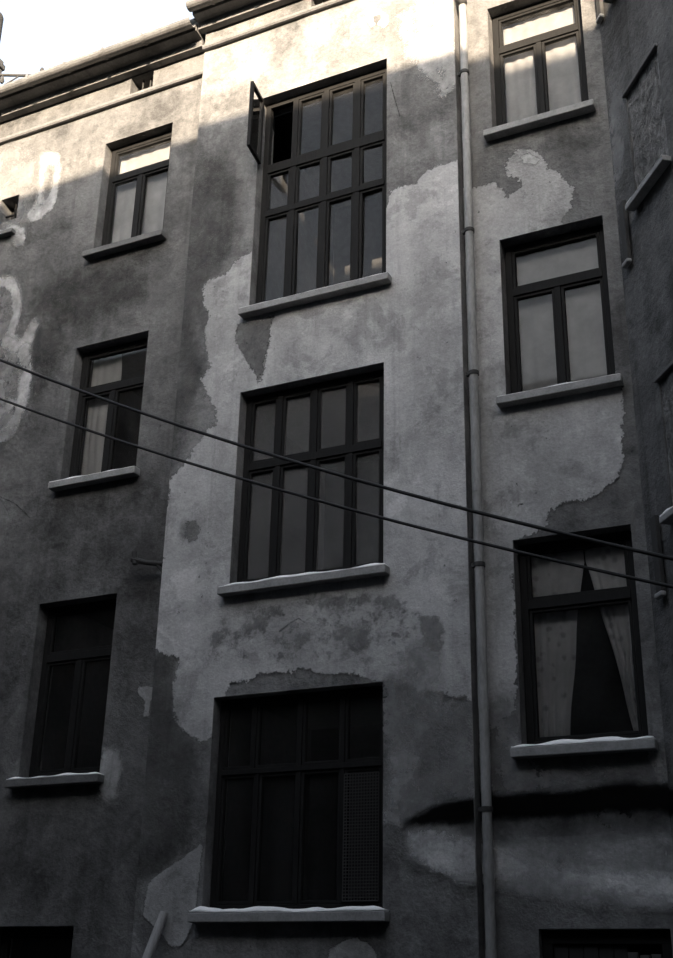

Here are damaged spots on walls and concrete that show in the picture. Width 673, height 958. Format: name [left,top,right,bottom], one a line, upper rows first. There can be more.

peeling [400,0,455,96]
peeling [156,148,626,744]
leakage [211,605,284,655]
spalling [137,686,153,717]
leakage [302,594,665,836]
spalling [98,749,123,799]
peeling [143,843,203,947]
spalling [328,937,377,958]